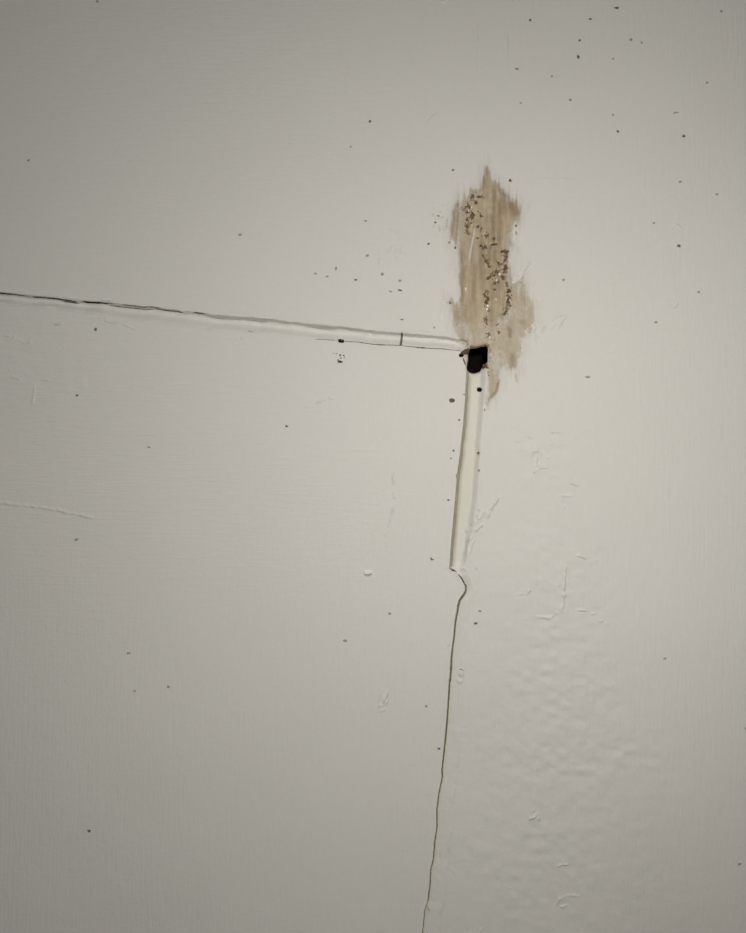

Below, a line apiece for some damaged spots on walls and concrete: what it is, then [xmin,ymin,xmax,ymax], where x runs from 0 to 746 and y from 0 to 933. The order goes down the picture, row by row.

spalling [463,344,488,373]
damp [449,168,537,397]
crack [0,283,497,933]